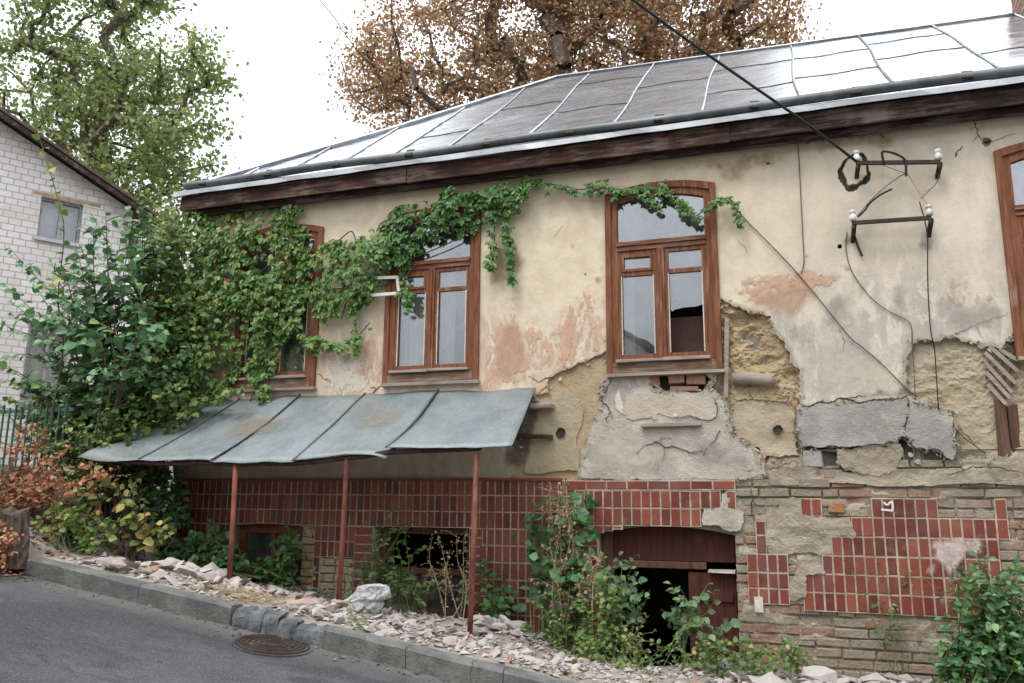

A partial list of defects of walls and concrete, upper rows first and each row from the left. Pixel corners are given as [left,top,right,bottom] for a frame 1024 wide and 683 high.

crack [528,350,607,394]
crack [598,380,613,423]
spalling [479,254,849,485]
spalling [902,333,1024,465]